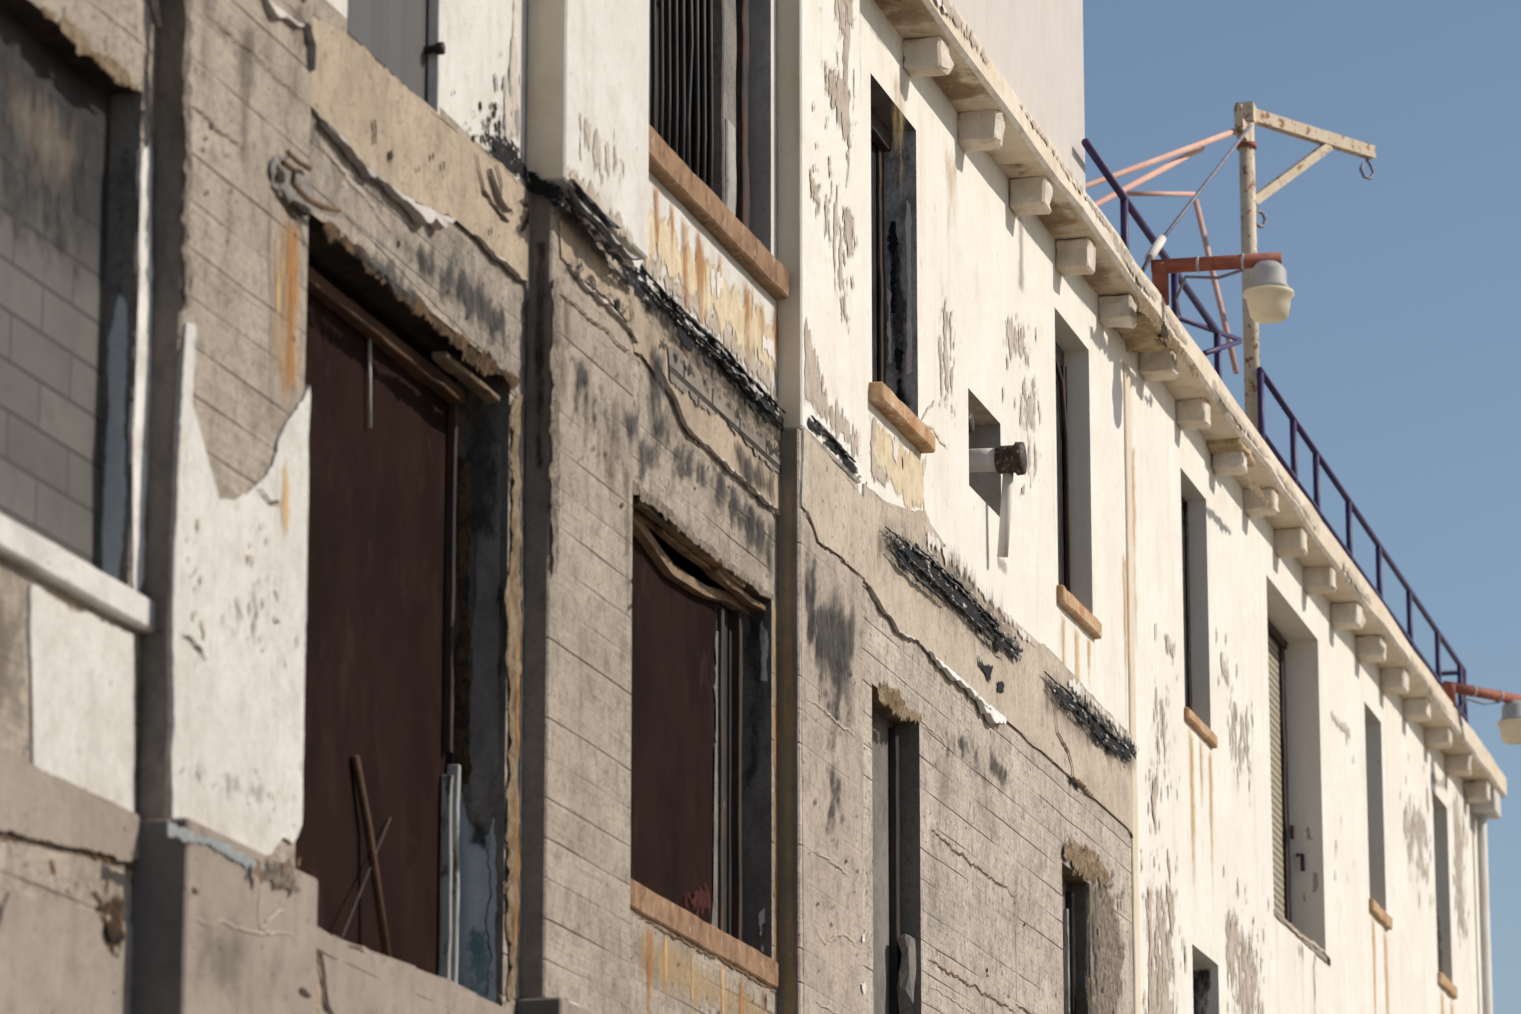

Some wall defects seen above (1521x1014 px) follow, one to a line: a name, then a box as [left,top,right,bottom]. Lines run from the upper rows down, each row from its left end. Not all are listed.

flaking render [166,0,311,937]
rust [269,176,307,419]
flaking render [270,0,531,1003]
water stain [534,242,546,414]
water stain [563,309,782,574]
rust [644,189,778,378]
peeling [810,0,858,336]
water stain [812,581,855,833]
crack [1052,692,1093,796]
crack [315,943,365,1014]
crack [929,830,1032,1014]
peeling [1224,863,1272,1014]